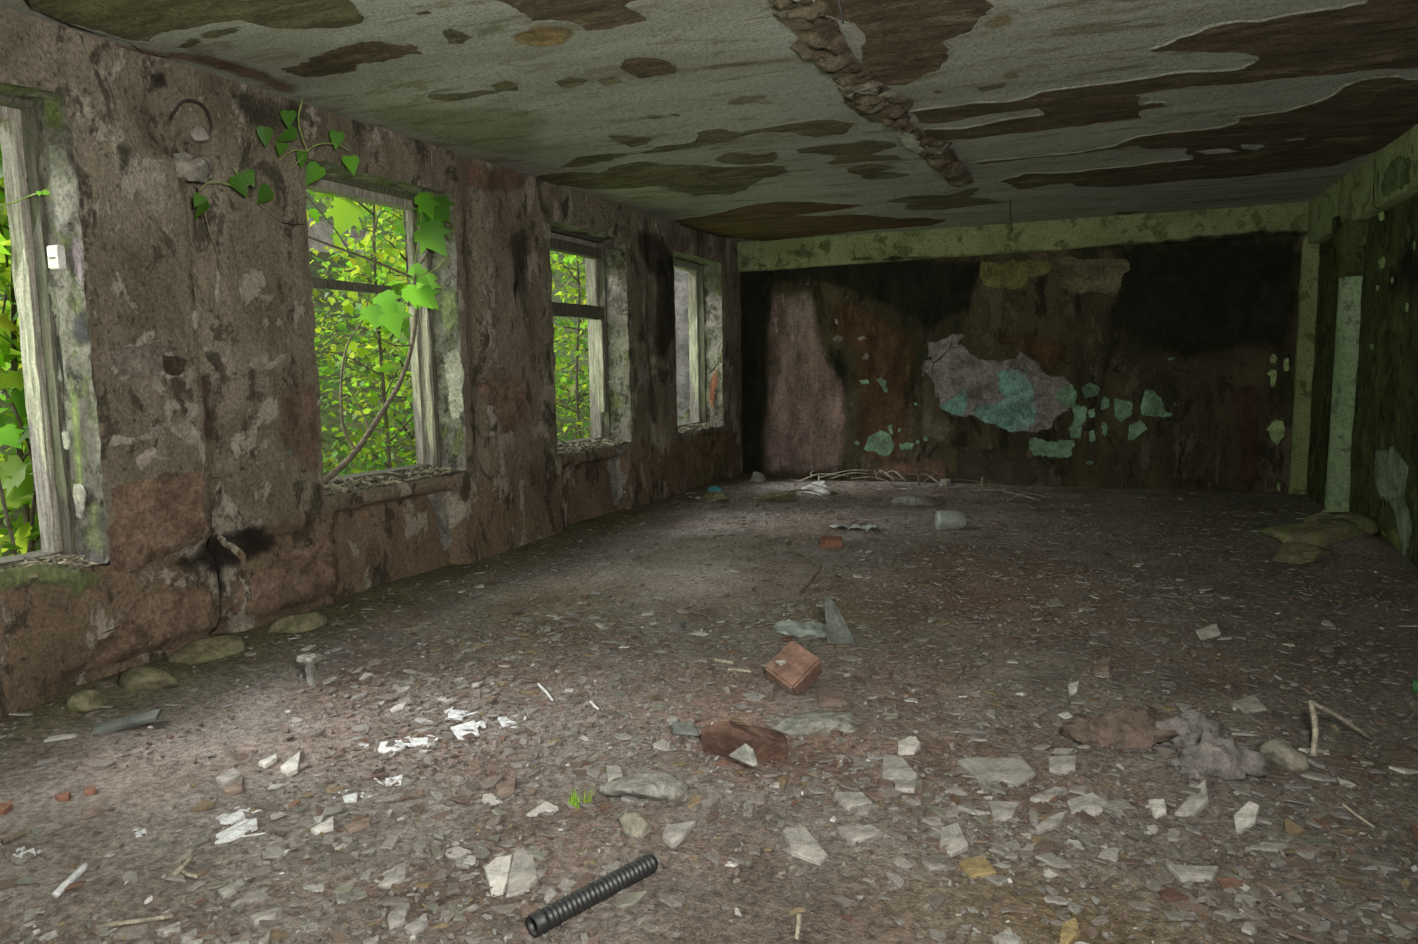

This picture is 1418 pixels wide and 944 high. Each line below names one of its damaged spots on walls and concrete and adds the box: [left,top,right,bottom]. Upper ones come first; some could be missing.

peeling [21,0,423,77]
peeling [443,28,472,44]
peeling [495,0,651,32]
peeling [427,81,519,101]
peeling [534,0,1418,241]
peeling [48,144,77,225]
peeling [73,239,82,282]
damp [691,256,979,487]
peeling [921,334,1176,465]